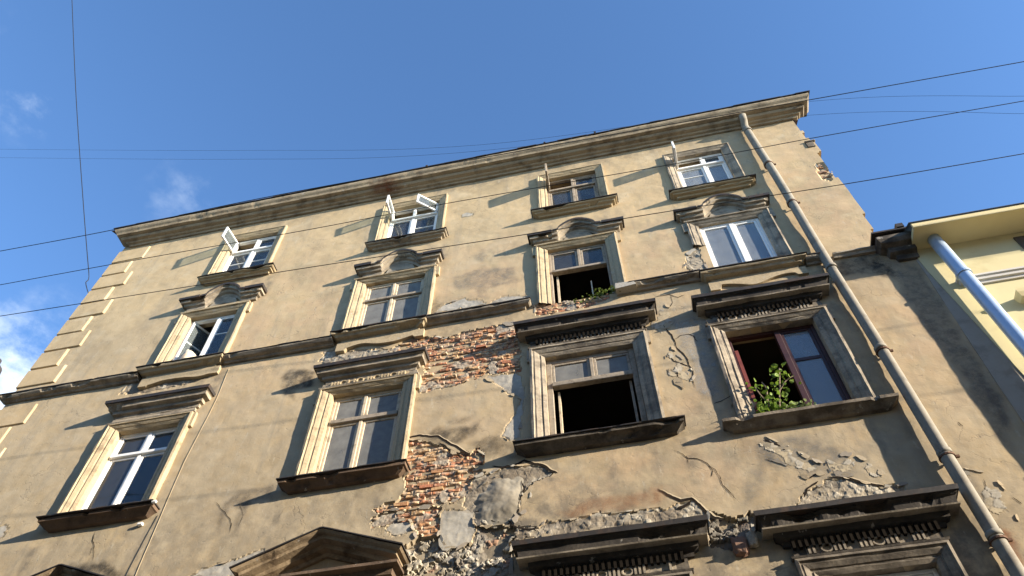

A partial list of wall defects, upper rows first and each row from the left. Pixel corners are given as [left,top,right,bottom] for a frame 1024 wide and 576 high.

flaking render [815,164,833,179]
flaking render [684,248,708,270]
flaking render [436,293,609,315]
crack [656,294,698,387]
flaking render [319,321,525,441]
flaking render [372,439,759,576]
crack [658,451,735,520]
flaking render [758,436,908,505]